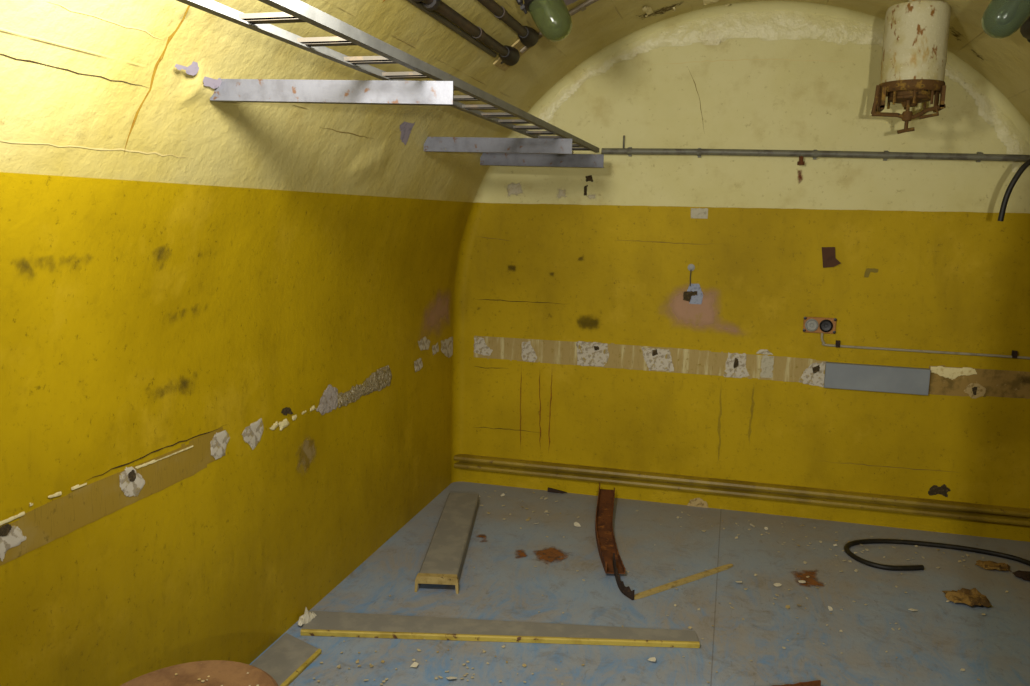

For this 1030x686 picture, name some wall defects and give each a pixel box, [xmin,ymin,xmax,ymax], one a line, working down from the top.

crack [0,54,145,87]
spalling [683,284,703,304]
spalling [474,337,493,356]
spalling [521,341,537,362]
spalling [576,341,609,367]
spalling [641,347,674,372]
spalling [723,349,774,378]
spalling [799,362,826,387]
spalling [210,365,392,460]
spalling [119,445,193,497]
spalling [0,503,33,561]